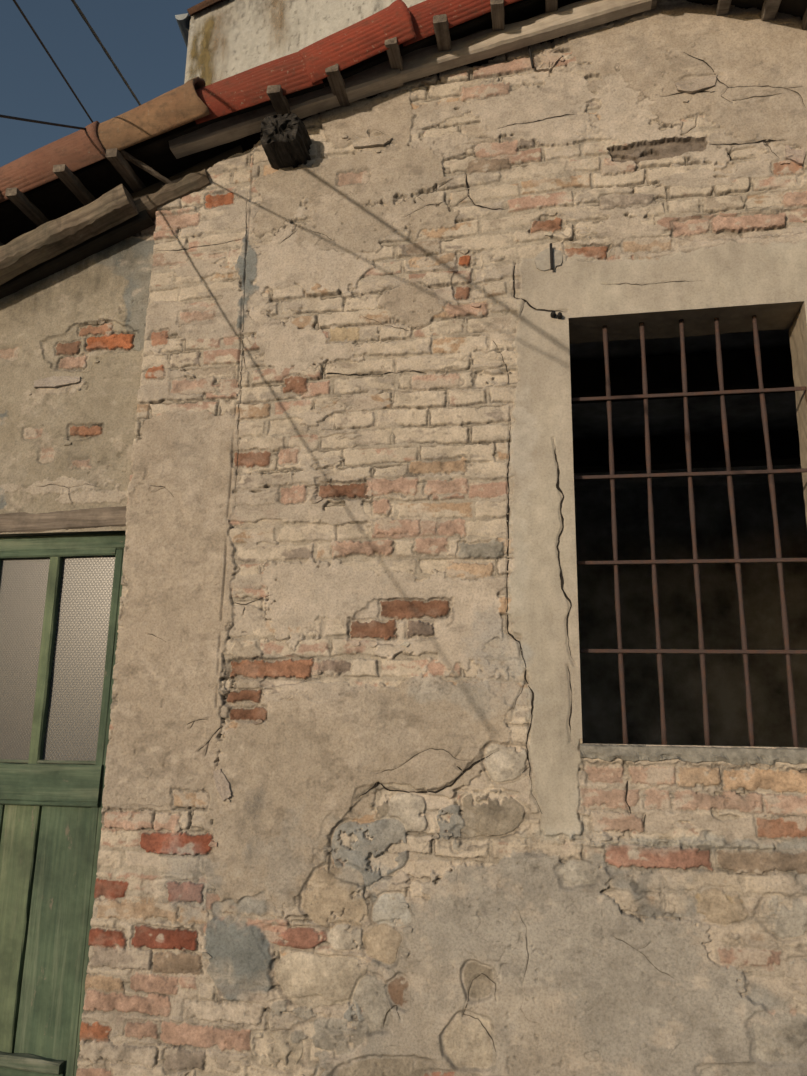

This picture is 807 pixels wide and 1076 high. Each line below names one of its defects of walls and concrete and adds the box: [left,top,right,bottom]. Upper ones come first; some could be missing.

water stain [190,18,214,86]
spalling [608,135,708,164]
crack [680,121,784,160]
crack [513,265,563,312]
spalling [26,318,141,395]
spalling [347,596,455,647]
crack [506,424,542,813]
crack [553,441,575,740]
spalling [218,653,322,725]
crack [359,748,497,797]
spalling [582,760,807,876]
spalling [76,740,533,1076]